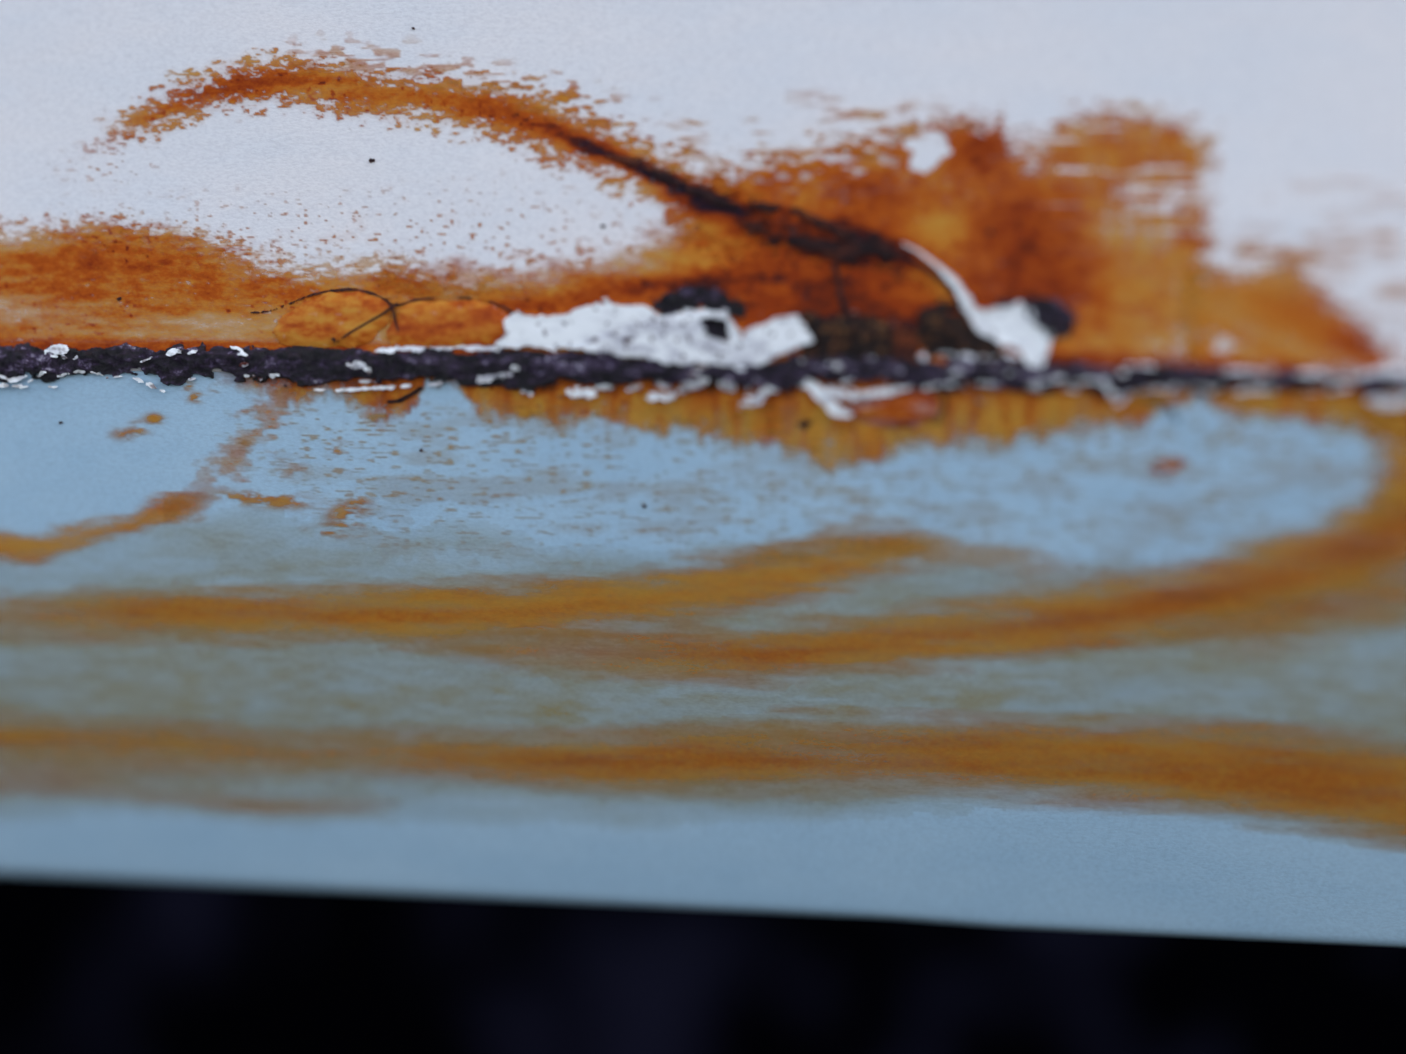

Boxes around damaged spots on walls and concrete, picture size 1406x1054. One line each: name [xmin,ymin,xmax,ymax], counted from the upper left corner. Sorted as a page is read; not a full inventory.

crack [606,155,967,317]
rust [0,47,1406,677]
peeling [314,243,1172,418]
peeling [1356,366,1406,409]
rust [0,724,1406,835]